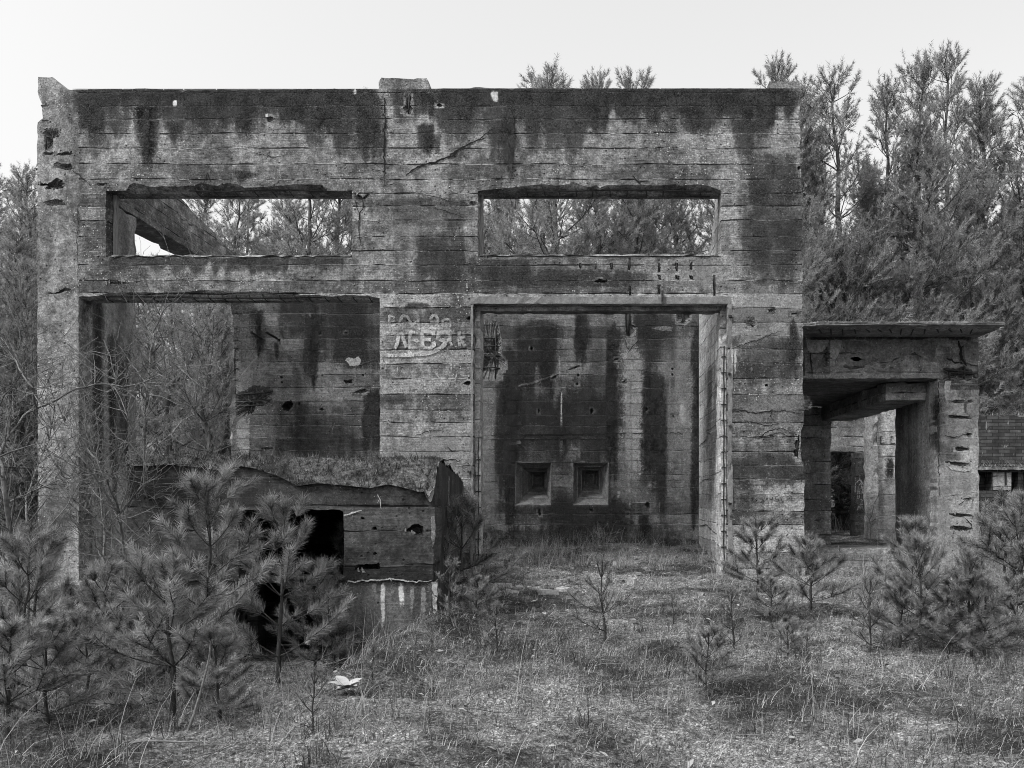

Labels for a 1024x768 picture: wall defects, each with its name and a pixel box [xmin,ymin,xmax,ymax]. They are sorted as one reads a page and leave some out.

spalling [36,120,74,206]
crack [355,98,492,245]
leakage [73,88,806,287]
leakage [234,309,278,391]
leakage [279,303,380,383]
leakage [236,417,251,455]
leakage [275,386,380,457]
leakage [494,314,699,537]
crack [937,341,975,541]
leakage [398,583,426,613]